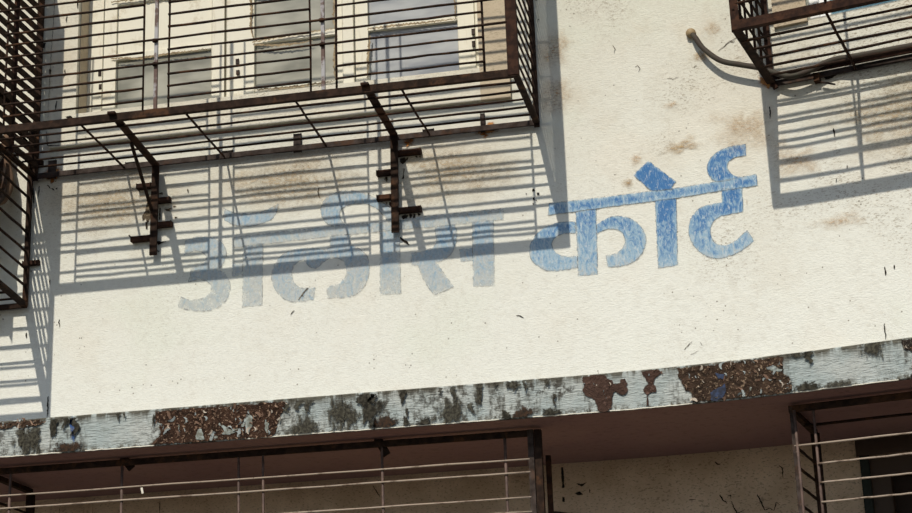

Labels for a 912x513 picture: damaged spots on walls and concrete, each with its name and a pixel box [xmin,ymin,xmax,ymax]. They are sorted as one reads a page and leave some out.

peeling [901,338,912,351]
peeling [582,375,628,412]
peeling [673,356,792,402]
peeling [0,418,46,430]
peeling [151,401,287,445]